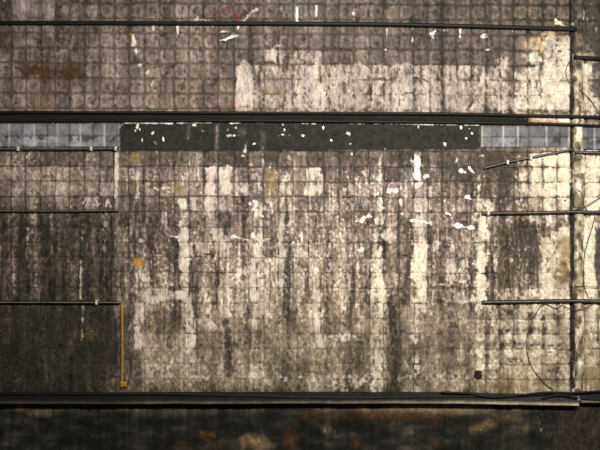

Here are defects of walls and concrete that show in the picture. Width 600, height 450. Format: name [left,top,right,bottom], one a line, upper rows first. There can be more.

peeling [234,31,574,113]
peeling [582,54,600,112]
damp [130,153,155,198]
damp [178,221,197,379]
damp [176,165,248,262]
damp [222,319,247,377]
damp [240,207,265,329]
damp [270,173,294,290]
damp [304,168,323,197]
damp [310,252,326,352]
damp [364,154,450,392]
damp [446,152,572,317]